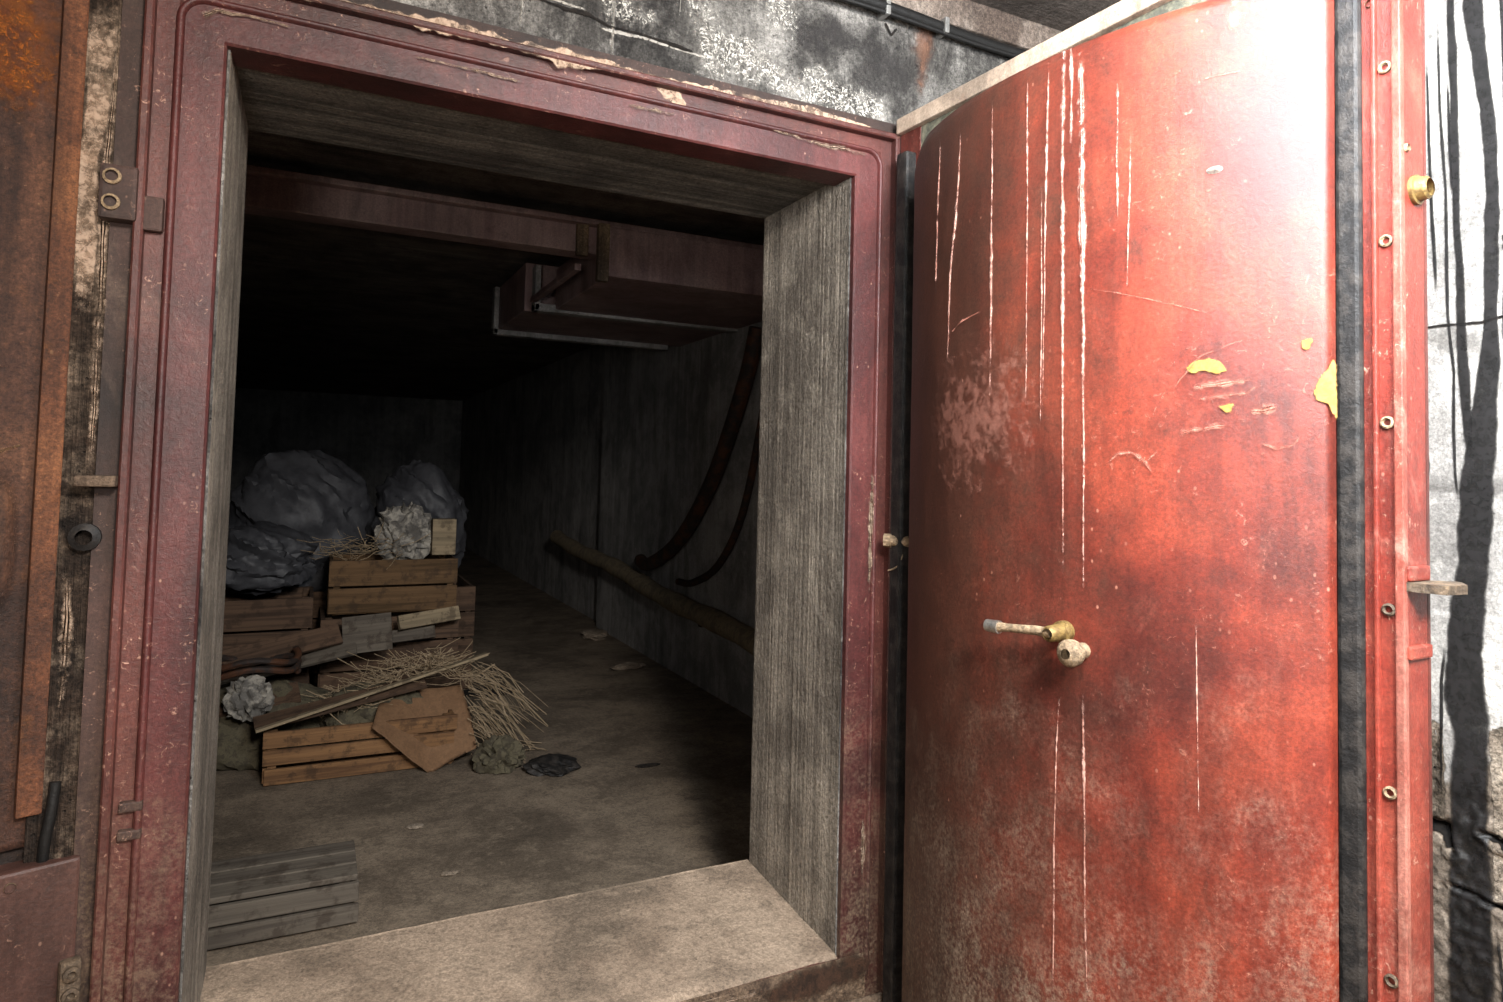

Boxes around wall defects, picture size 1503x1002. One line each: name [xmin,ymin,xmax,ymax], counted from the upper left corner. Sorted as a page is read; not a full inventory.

corrosion [0,0,58,96]
peeling [205,9,288,27]
peeling [347,1,633,71]
peeling [418,57,518,81]
peeling [634,75,733,113]
peeling [753,96,870,127]
damp [1426,0,1503,1002]
spalling [1432,720,1446,820]
crack [1433,818,1453,848]
spalling [1489,727,1503,903]
crack [1489,835,1503,850]